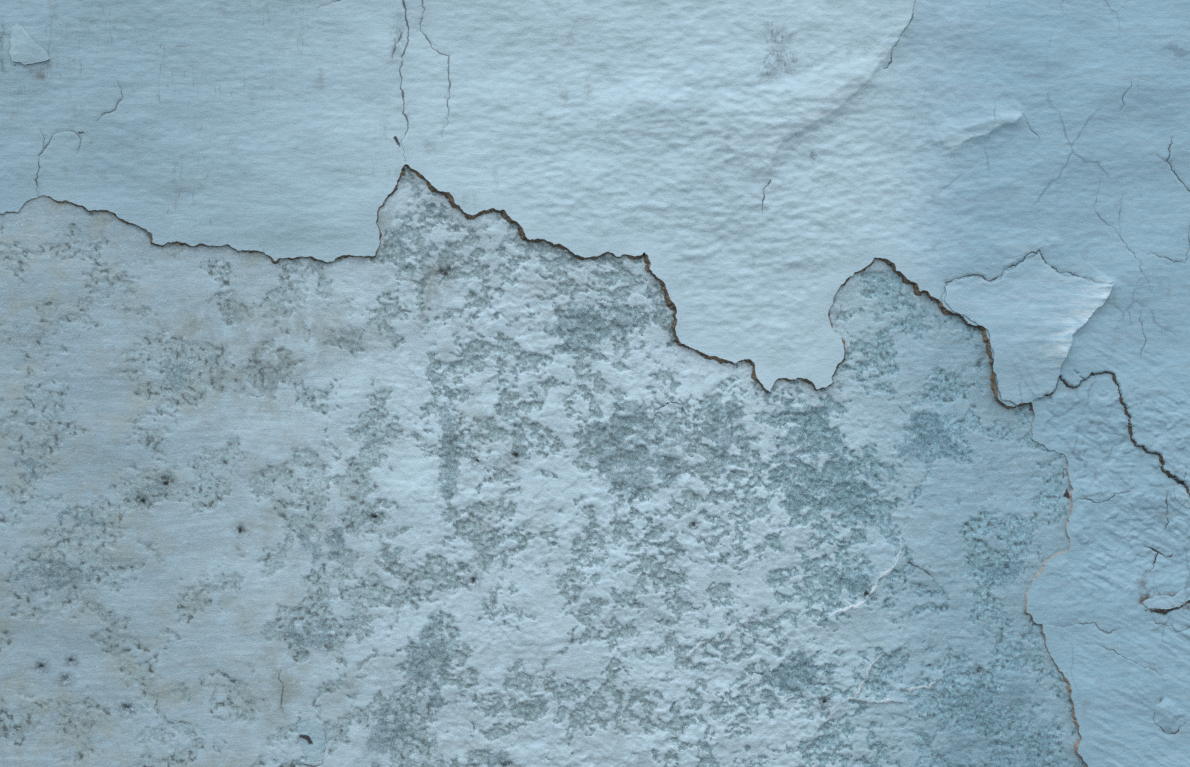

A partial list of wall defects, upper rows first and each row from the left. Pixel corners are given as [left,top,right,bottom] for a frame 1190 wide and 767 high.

peeling [0,23,50,71]
crack [399,0,409,158]
crack [1157,138,1190,192]
crack [941,249,1115,301]
peeling [0,164,1114,767]